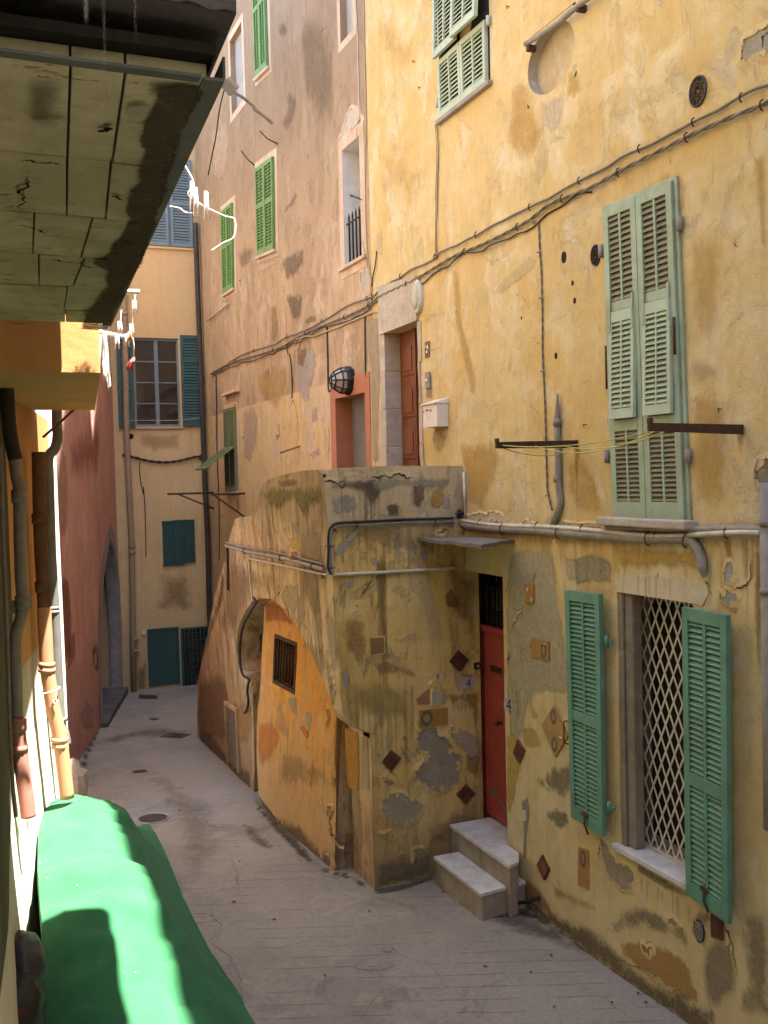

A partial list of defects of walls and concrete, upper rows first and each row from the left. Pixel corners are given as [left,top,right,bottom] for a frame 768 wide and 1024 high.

spalling [736,18,768,70]
crack [16,160,64,234]
leakage [82,87,204,330]
crack [372,470,415,482]
spalling [716,557,742,613]
peeling [507,550,610,858]
spalling [378,725,479,831]
leakage [615,910,685,940]